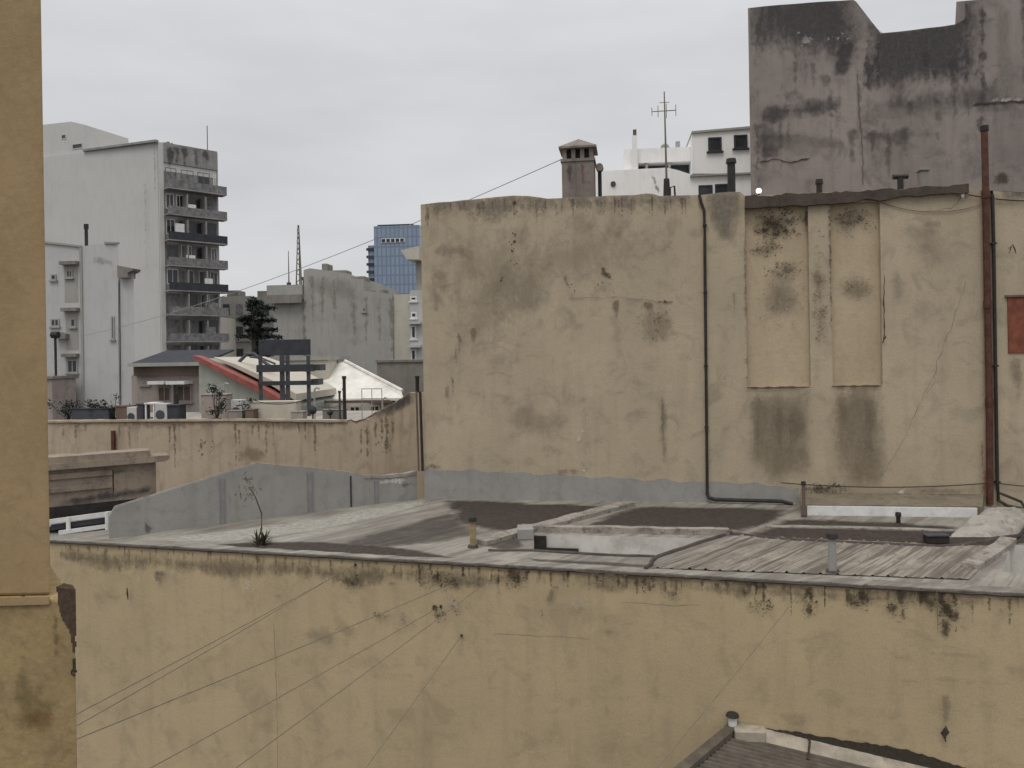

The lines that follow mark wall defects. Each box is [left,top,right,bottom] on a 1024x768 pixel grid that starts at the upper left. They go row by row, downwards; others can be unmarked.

water stain [756,1,854,73]
water stain [865,3,985,87]
water stain [764,101,836,122]
water stain [458,200,517,214]
water stain [711,192,876,347]
crack [880,276,966,476]
water stain [365,393,410,456]
spalling [56,583,77,673]
water stain [414,564,527,590]
water stain [742,582,774,617]
water stain [790,586,826,620]
water stain [845,583,963,636]